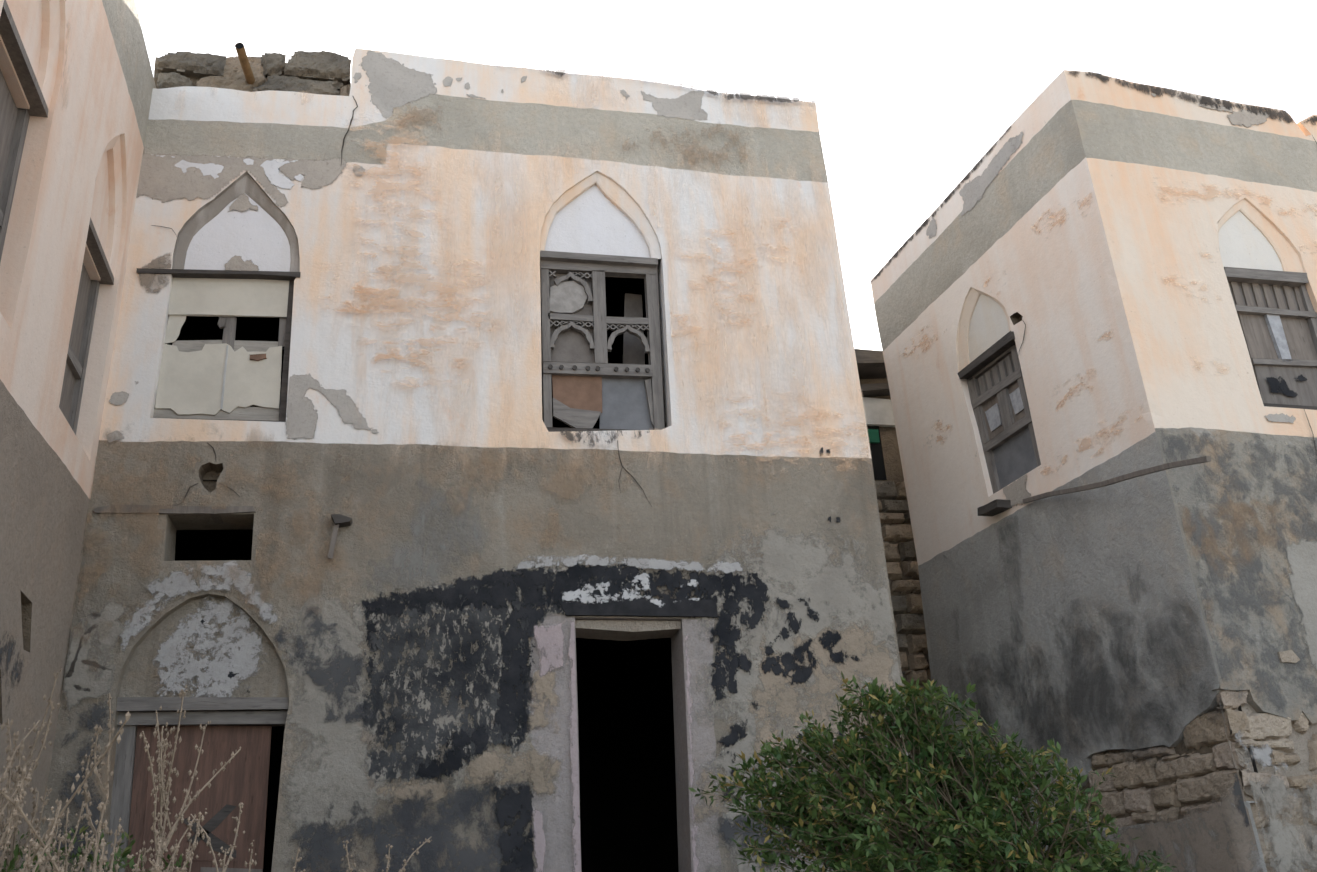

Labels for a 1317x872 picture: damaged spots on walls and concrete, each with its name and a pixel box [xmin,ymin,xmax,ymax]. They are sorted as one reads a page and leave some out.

crack [341,97,358,164]
peeling [353,50,485,119]
peeling [620,90,708,120]
peeling [136,153,365,212]
peeling [959,132,1023,216]
peeling [285,374,379,439]
spalling [168,443,240,506]
damp [1163,434,1317,709]
spalling [21,591,32,652]
spalling [63,516,912,872]
damp [1001,635,1170,747]
spalling [1080,690,1317,872]